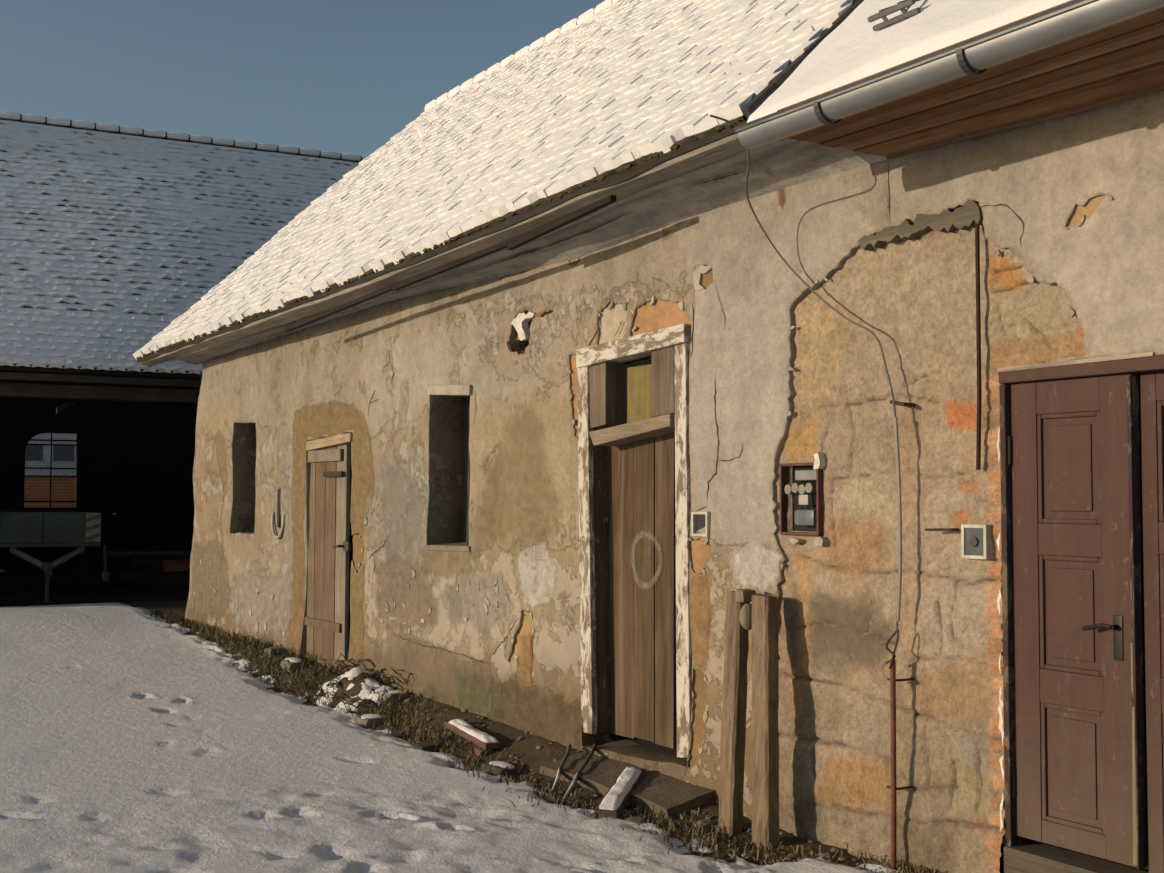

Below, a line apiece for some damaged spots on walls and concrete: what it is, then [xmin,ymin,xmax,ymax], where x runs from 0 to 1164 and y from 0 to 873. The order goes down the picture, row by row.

crack [981,204,1024,245]
spalling [1063,194,1114,230]
spalling [693,265,713,291]
spalling [598,295,690,344]
crack [690,285,725,356]
crack [697,389,743,511]
spalling [776,199,1086,873]